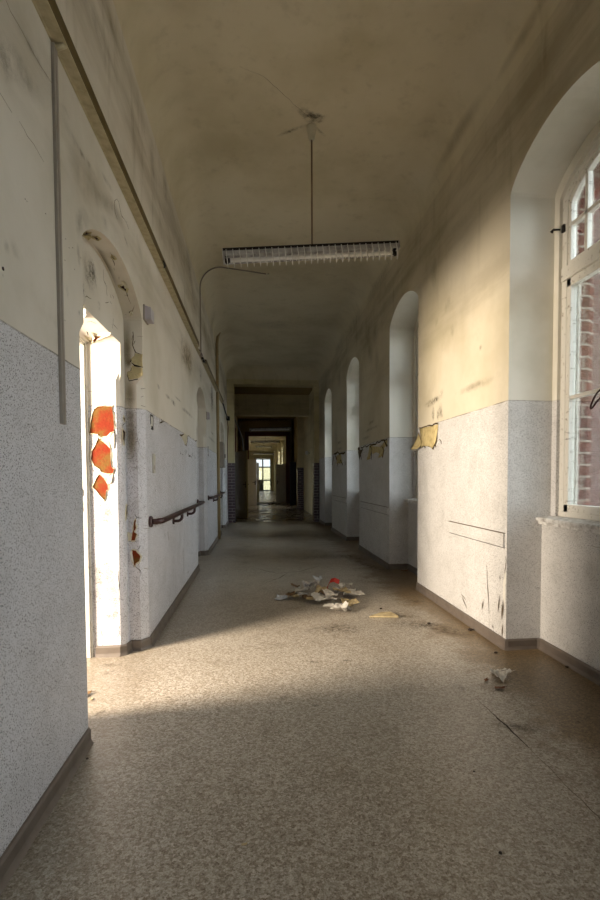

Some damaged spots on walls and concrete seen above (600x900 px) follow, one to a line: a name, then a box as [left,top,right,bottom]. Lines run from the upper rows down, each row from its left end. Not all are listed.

peeling [127,334,143,381]
spalling [89,404,126,502]
spalling [125,504,142,576]
crack [477,699,600,819]